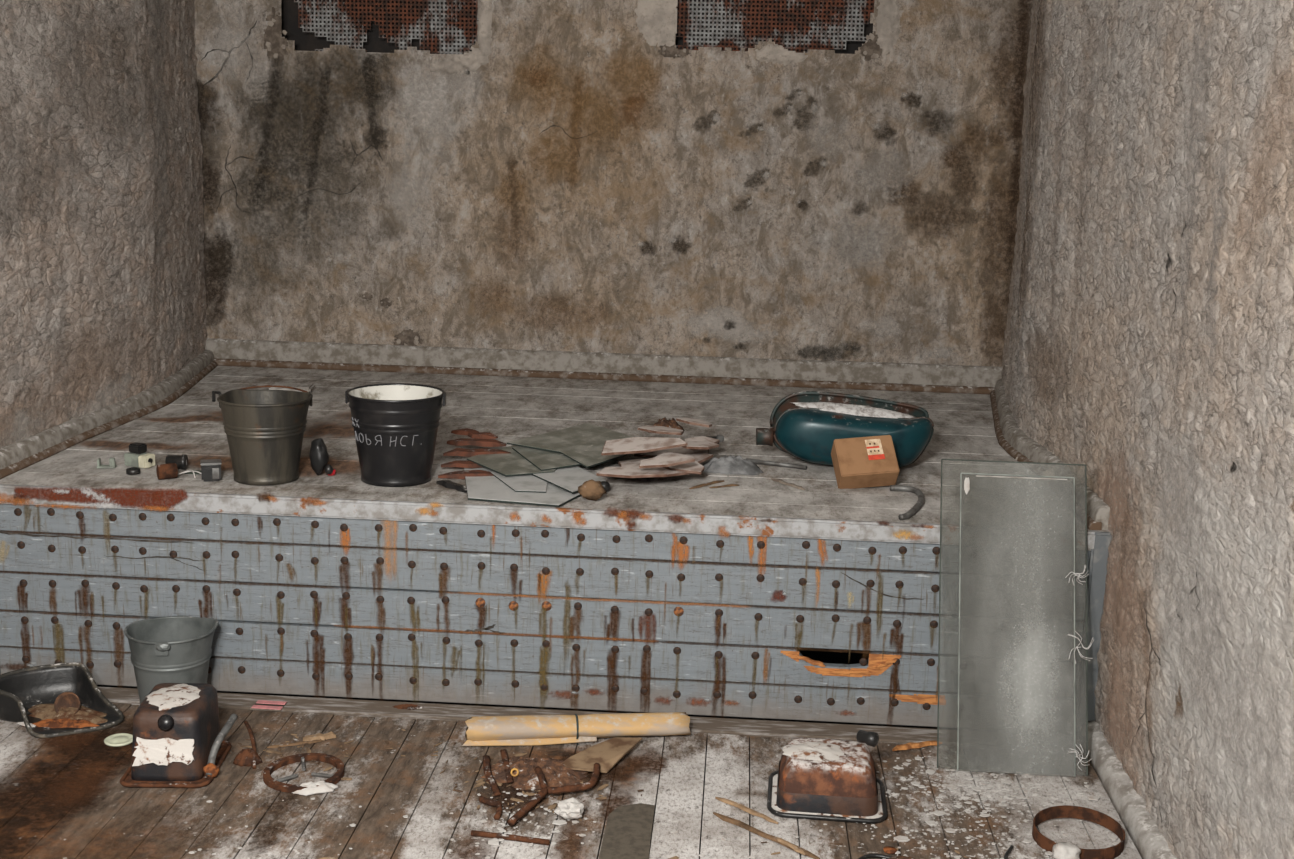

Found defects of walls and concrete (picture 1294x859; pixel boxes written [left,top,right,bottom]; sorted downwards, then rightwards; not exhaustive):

leakage [197,85,219,133]
leakage [202,53,390,322]
leakage [890,0,1030,276]
corrosion [0,487,436,695]
corrosion [604,509,648,529]
corrosion [393,514,939,716]
spalling [781,651,901,677]
leakage [0,723,133,859]